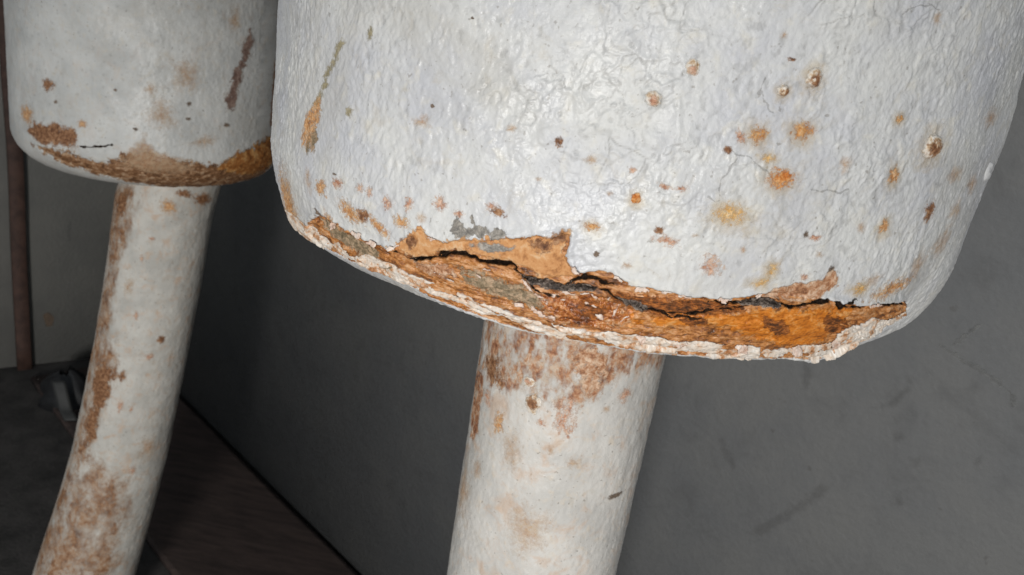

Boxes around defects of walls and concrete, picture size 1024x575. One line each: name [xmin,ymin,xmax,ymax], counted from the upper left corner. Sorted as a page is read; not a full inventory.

rust [224,28,254,111]
rust [301,40,344,153]
rust [307,174,412,239]
rust [652,227,676,246]
rust [724,127,769,154]
rust [763,154,795,190]
rust [790,122,814,139]
rust [21,63,298,575]
peeling [285,208,907,364]
crack [393,250,905,320]
rust [855,264,919,303]
rust [470,320,663,442]